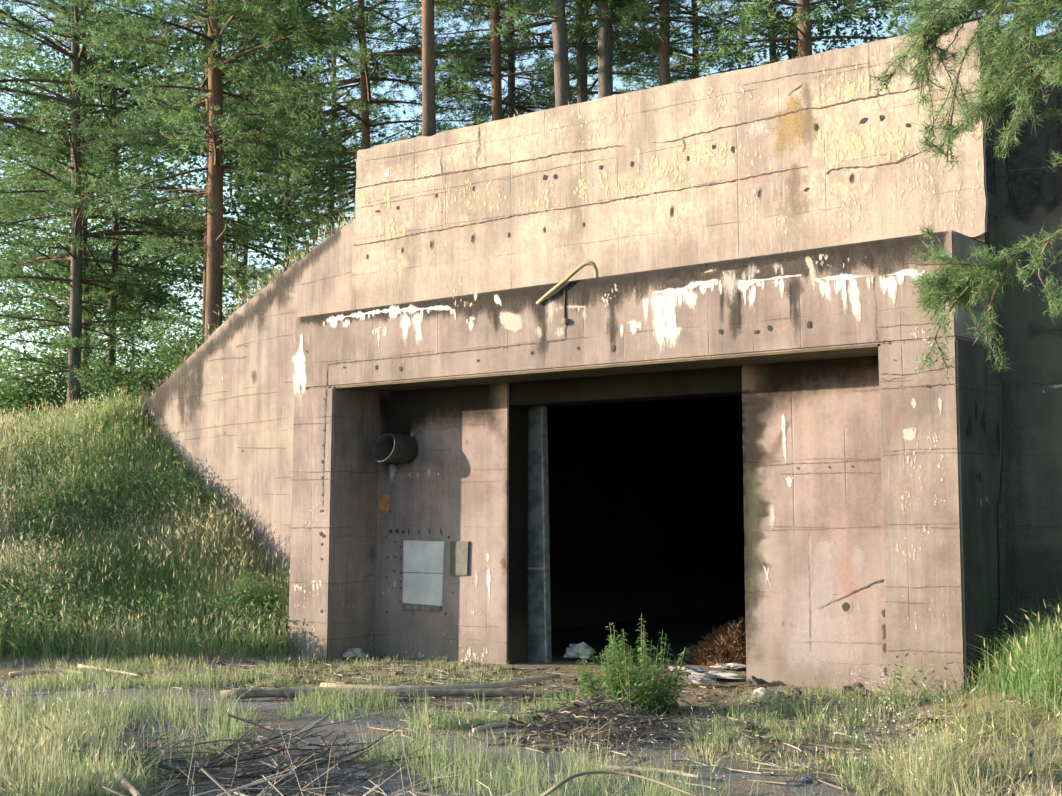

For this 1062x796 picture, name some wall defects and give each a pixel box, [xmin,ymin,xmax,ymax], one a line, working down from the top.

damp [982,60,1062,219]
damp [140,229,341,429]
damp [292,231,945,394]
damp [969,208,998,258]